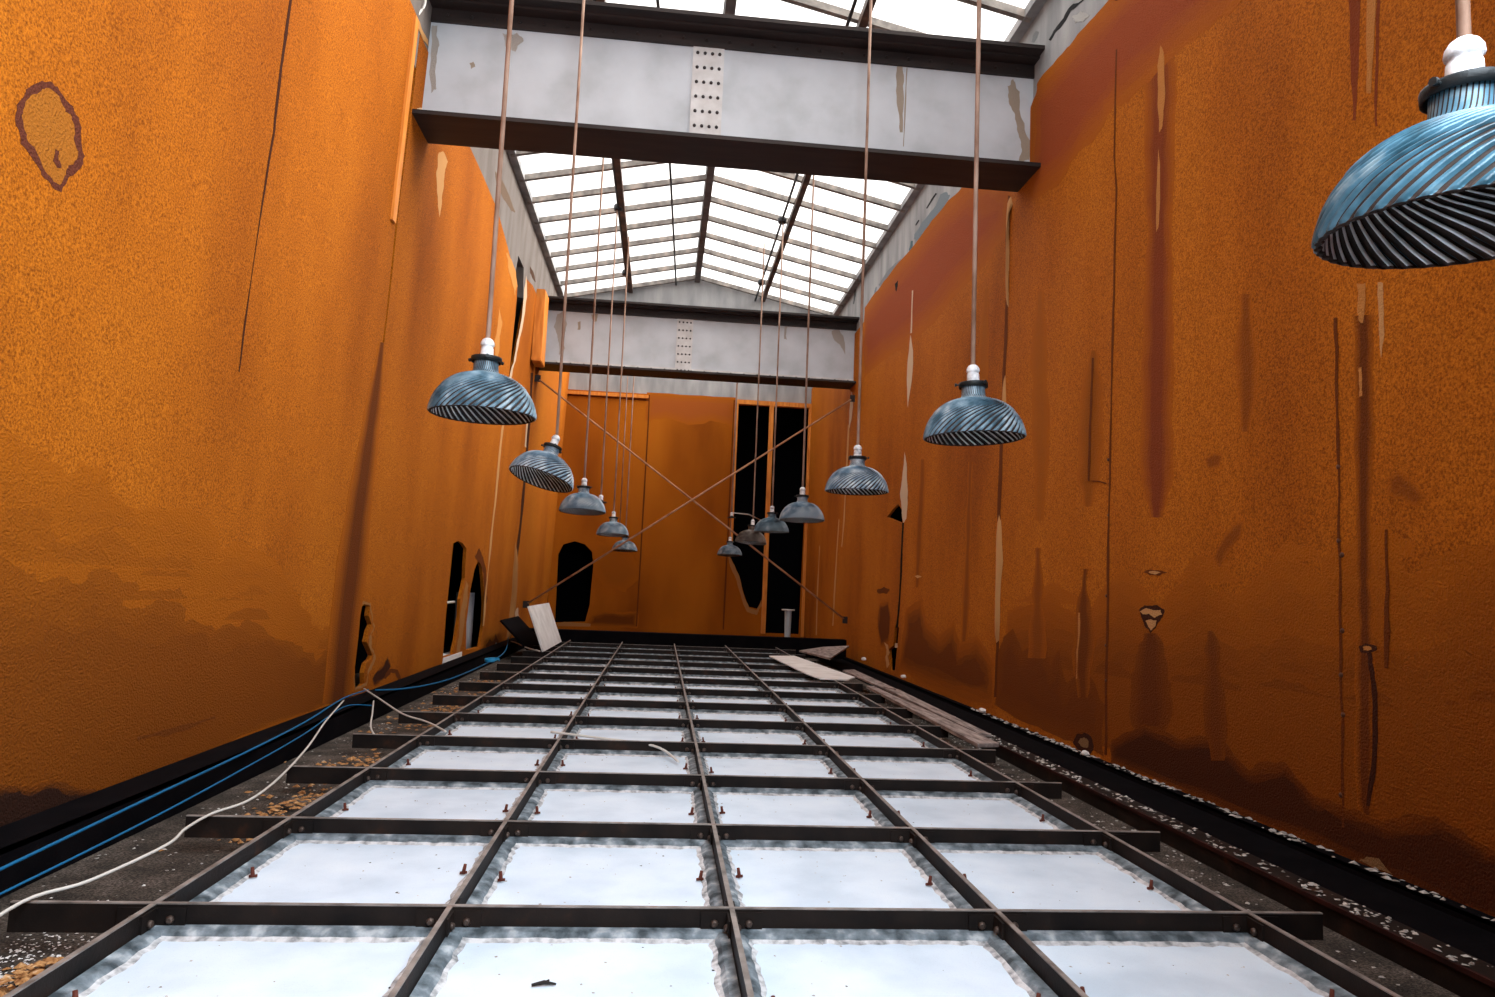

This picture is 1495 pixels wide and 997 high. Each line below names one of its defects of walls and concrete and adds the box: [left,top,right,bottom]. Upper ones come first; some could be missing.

leakage [15,81,85,192]
leakage [0,342,385,827]
leakage [372,656,401,687]
spalling [1139,605,1165,633]
leakage [877,290,1495,917]